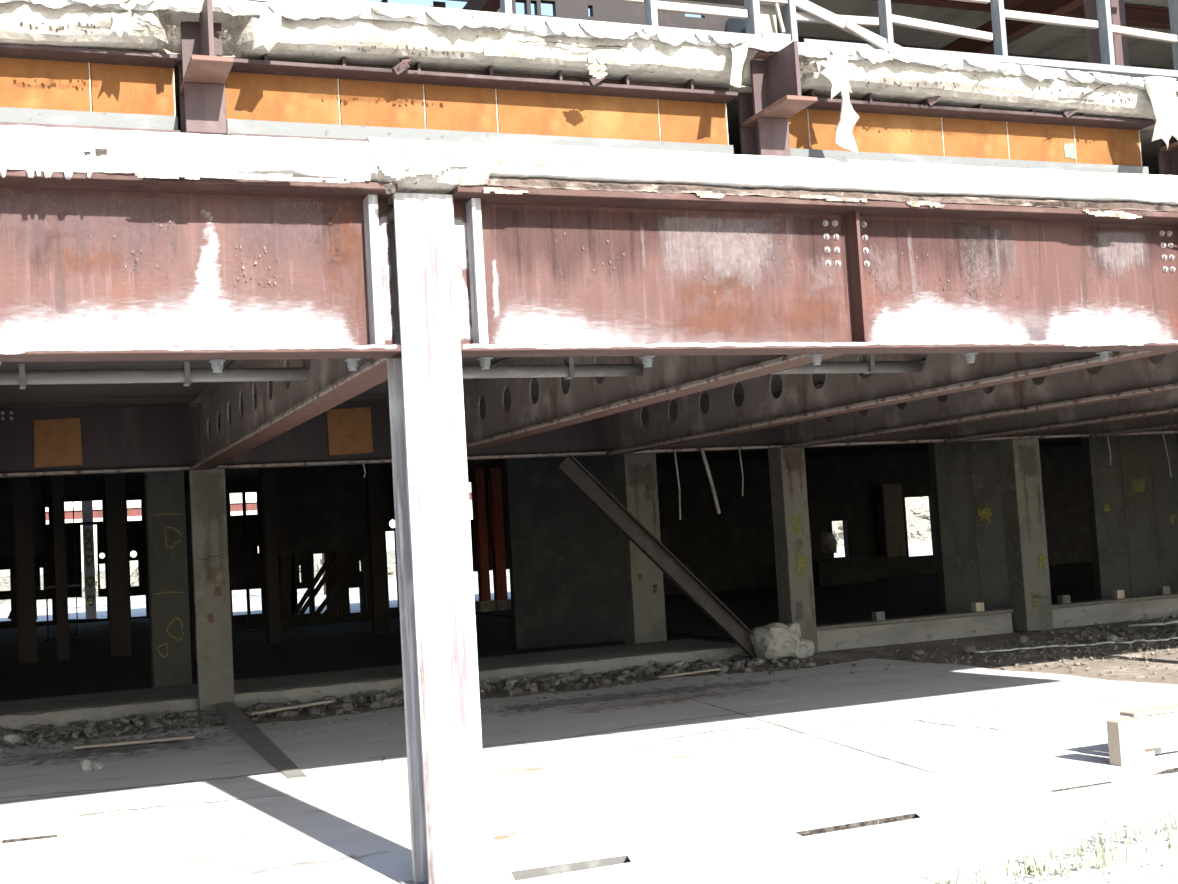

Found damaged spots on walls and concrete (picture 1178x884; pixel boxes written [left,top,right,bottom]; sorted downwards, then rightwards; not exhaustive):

peeling [20,21,95,35]
peeling [395,45,464,58]
spalling [586,63,608,79]
spalling [83,148,108,156]
spalling [135,159,365,183]
spalling [377,139,474,194]
leakage [0,193,176,258]
leakage [0,223,397,354]
leakage [463,260,1178,349]